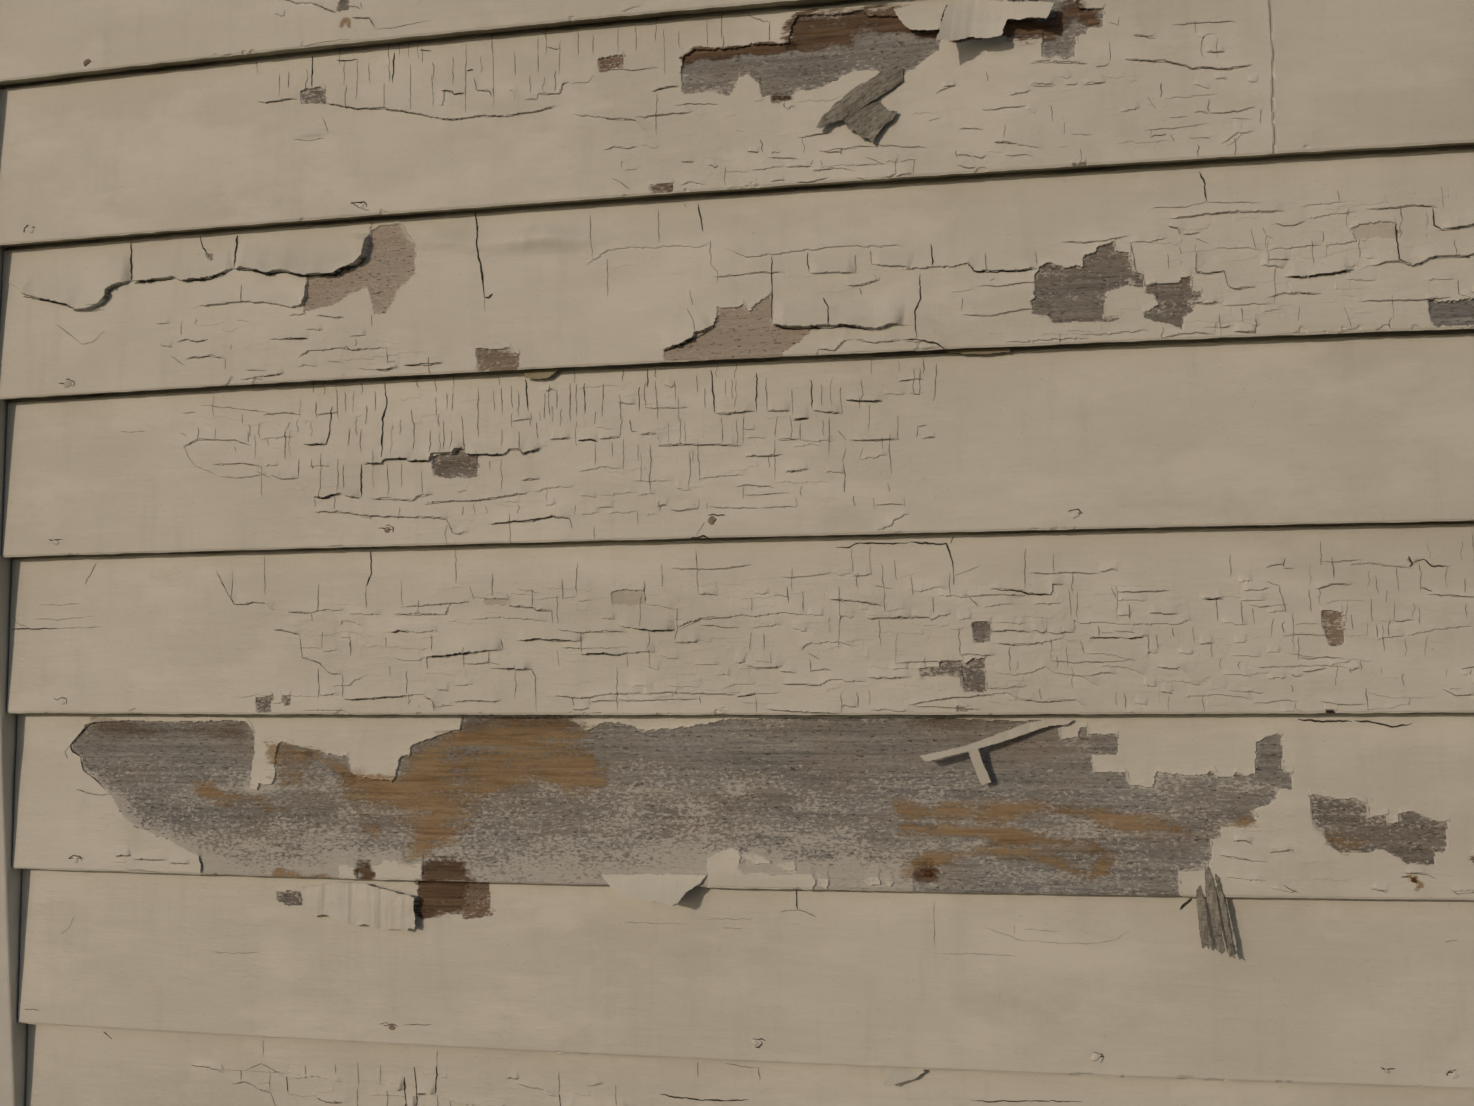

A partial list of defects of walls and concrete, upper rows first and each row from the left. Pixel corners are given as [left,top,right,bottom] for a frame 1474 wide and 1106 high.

peeling [191,0,1272,197]
crack [475,212,493,309]
crack [691,514,725,539]
peeling [13,176,1474,959]
crack [836,536,954,585]
crack [1408,556,1450,567]
crack [661,1038,765,1101]
crack [972,1097,1082,1105]